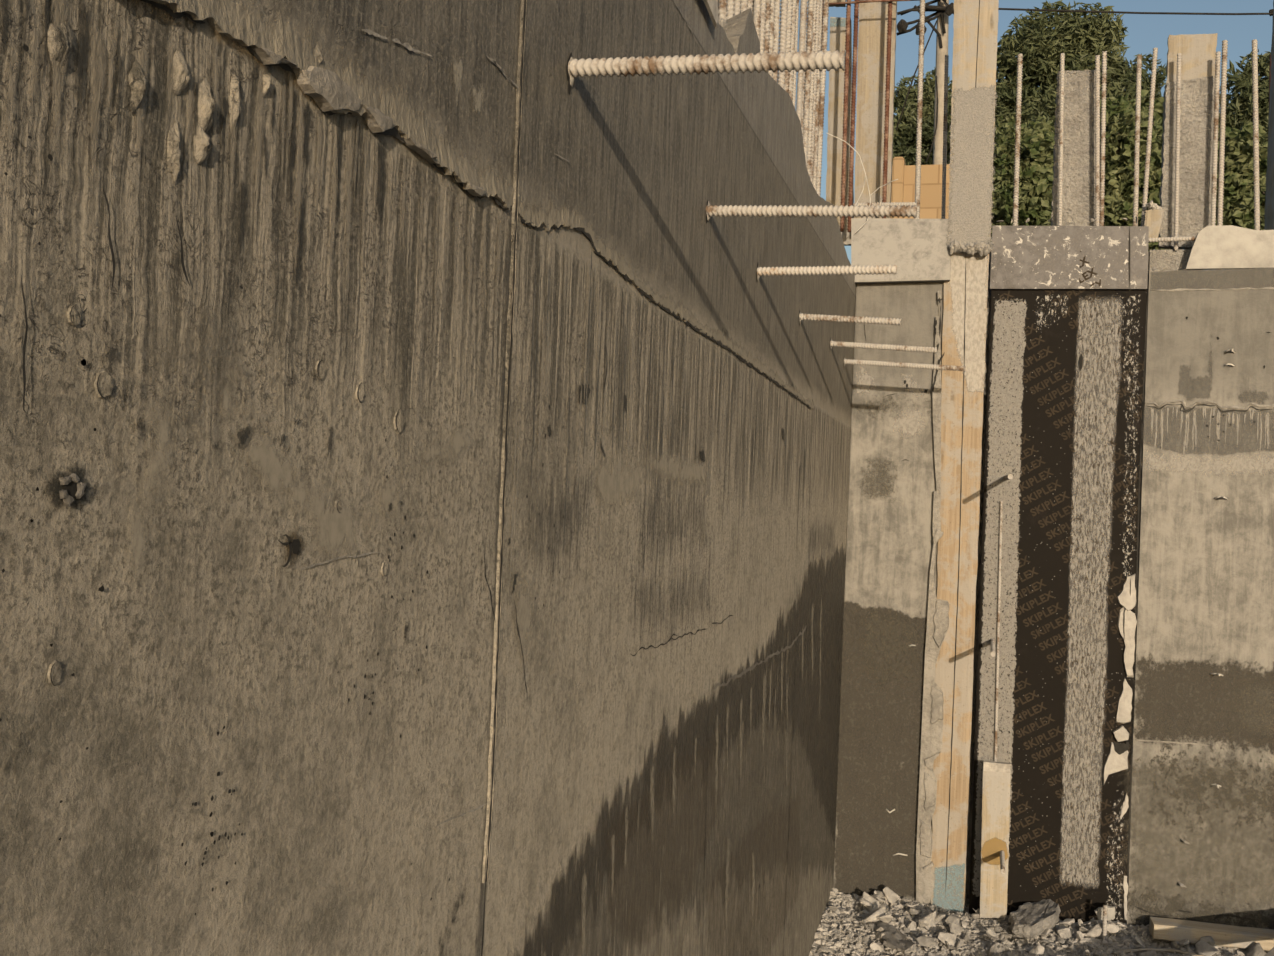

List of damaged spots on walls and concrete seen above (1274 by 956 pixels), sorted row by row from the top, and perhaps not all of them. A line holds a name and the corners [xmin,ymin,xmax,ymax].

damp [2,0,123,175]
damp [453,61,482,111]
damp [167,43,406,283]
crack [102,185,115,291]
crack [176,217,190,286]
crack [21,274,30,414]
damp [1144,351,1274,476]
crack [631,615,733,656]
damp [510,251,932,956]
damp [1127,656,1274,929]